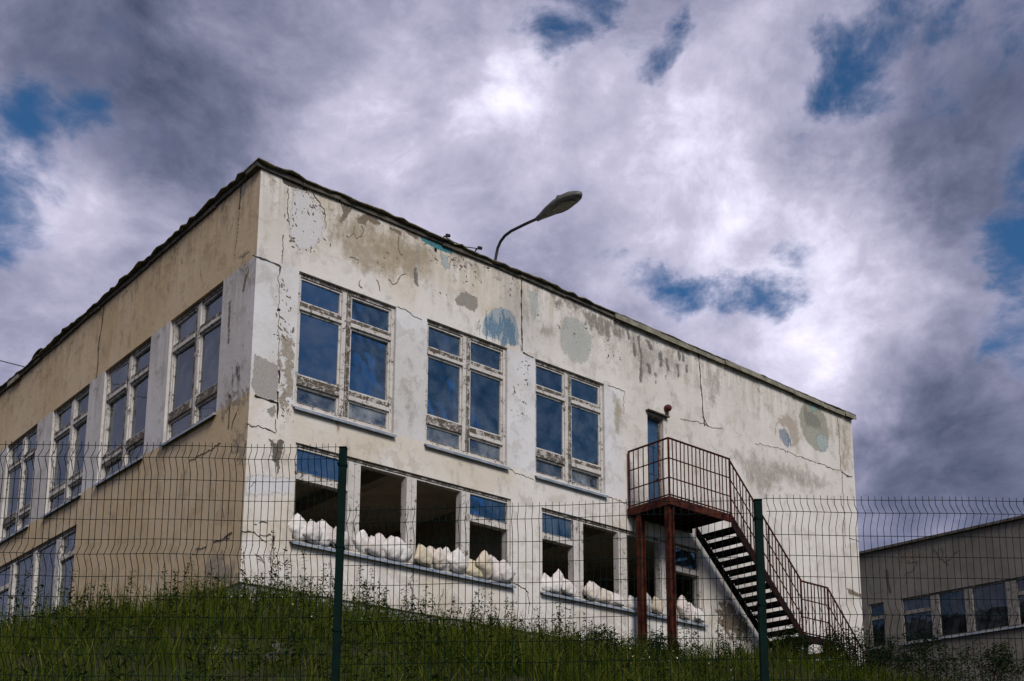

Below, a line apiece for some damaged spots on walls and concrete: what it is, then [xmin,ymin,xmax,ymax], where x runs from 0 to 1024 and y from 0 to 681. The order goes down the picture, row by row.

spalling [282,178,331,252]
spalling [339,204,495,312]
crack [189,185,326,461]
spalling [221,278,295,422]
damp [551,293,688,383]
crack [680,354,721,429]
crack [755,416,860,548]